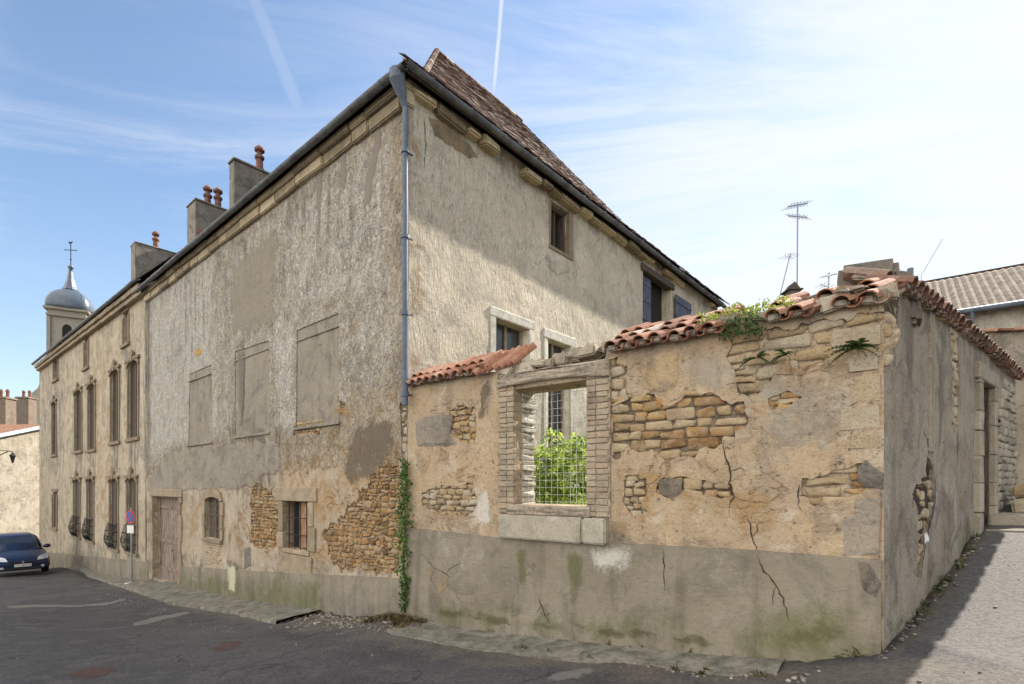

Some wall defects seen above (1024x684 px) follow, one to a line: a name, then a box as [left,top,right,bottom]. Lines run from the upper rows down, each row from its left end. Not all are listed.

flaking render [610,311,901,462]
damp [346,421,393,483]
flaking render [450,403,476,445]
flaking render [250,484,279,553]
flaking render [323,405,407,577]
flaking render [422,472,477,524]
damp [594,551,622,567]
flaking render [623,475,734,516]
crack [723,443,789,620]
flaking render [801,463,866,506]
flaking render [912,474,933,583]